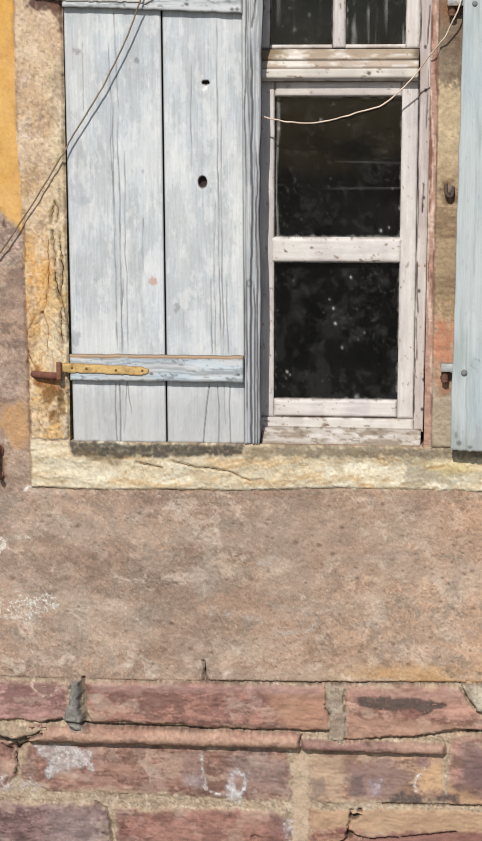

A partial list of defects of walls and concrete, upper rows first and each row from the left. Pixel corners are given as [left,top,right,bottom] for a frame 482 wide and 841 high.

flaking render [0,211,482,697]
spalling [358,697,446,719]
water stain [34,744,94,778]